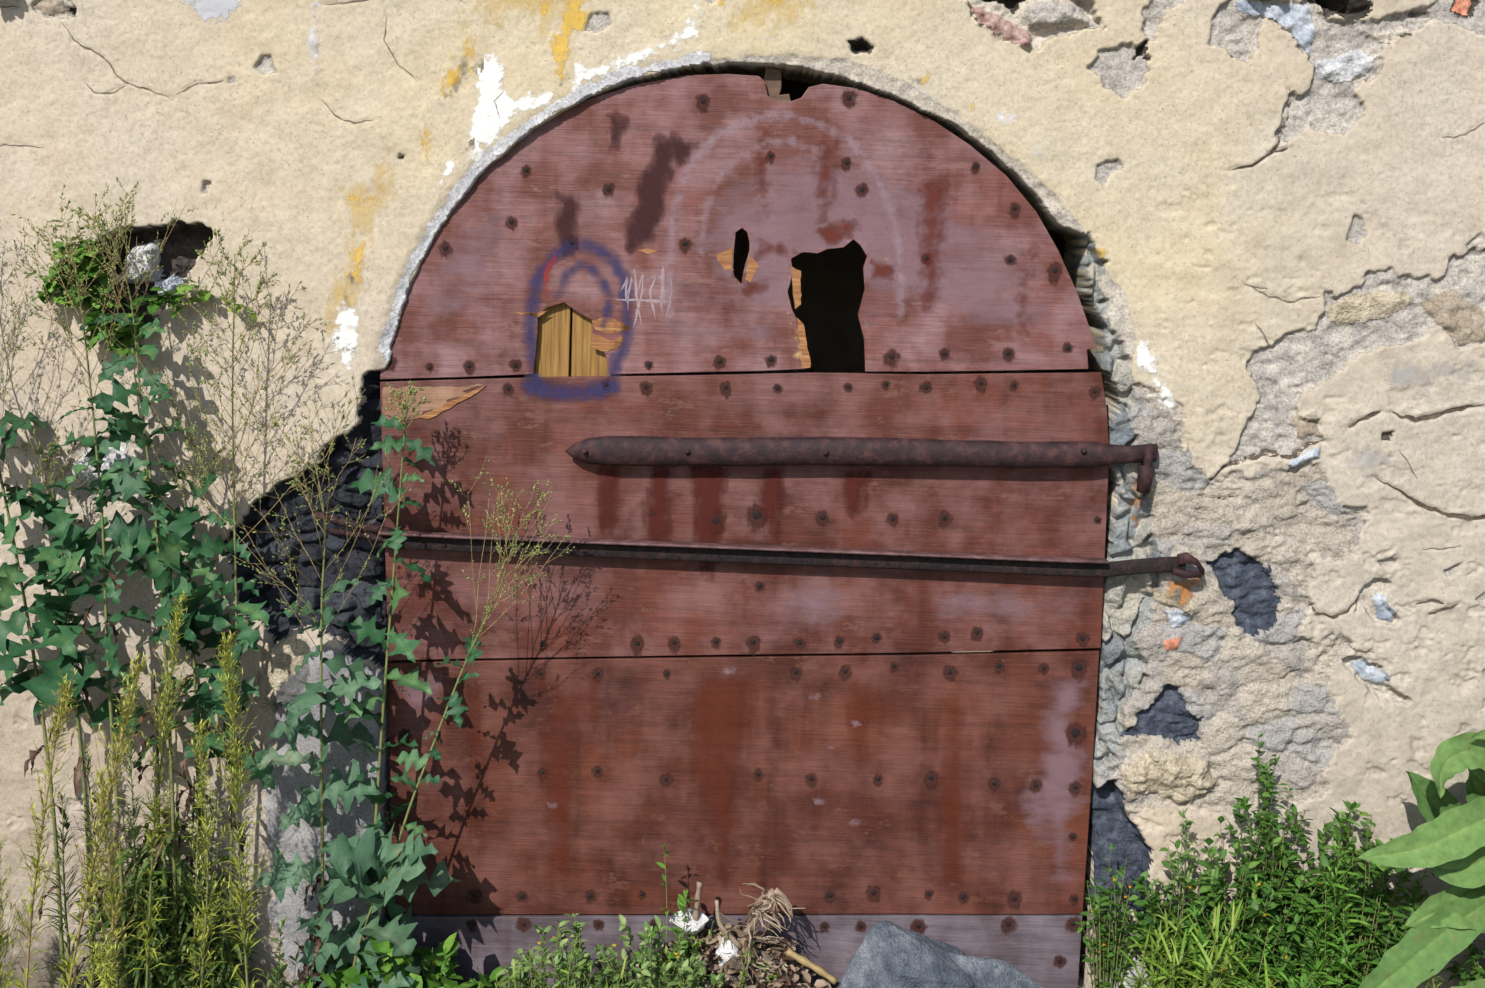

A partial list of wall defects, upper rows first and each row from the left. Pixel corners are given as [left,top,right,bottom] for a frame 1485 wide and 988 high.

crack [61,21,223,100]
damp [571,0,699,91]
spalling [967,0,1102,51]
spalling [1087,0,1184,98]
spalling [1208,0,1485,141]
damp [434,54,553,192]
rust [557,198,577,254]
rust [626,137,690,252]
rust [691,466,724,543]
spalling [223,51,1485,912]
crack [1202,405,1485,550]
crack [1416,599,1458,614]